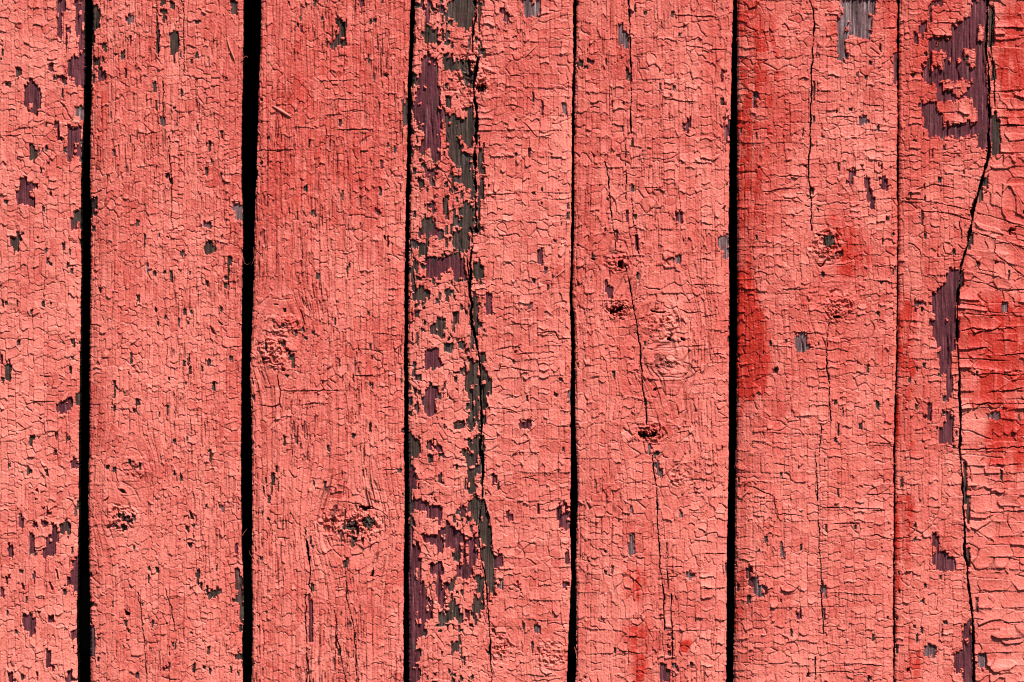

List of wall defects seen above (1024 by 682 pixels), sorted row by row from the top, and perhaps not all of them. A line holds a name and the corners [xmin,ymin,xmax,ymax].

peeling [5,67,46,122]
peeling [48,0,107,88]
peeling [826,0,883,63]
peeling [913,0,1008,160]
crack [605,0,663,425]
crack [261,333,399,408]
peeling [396,0,513,682]
crack [467,0,570,680]
crack [749,0,1024,682]
peeling [914,267,982,451]
crack [304,527,312,629]
crack [652,455,726,682]